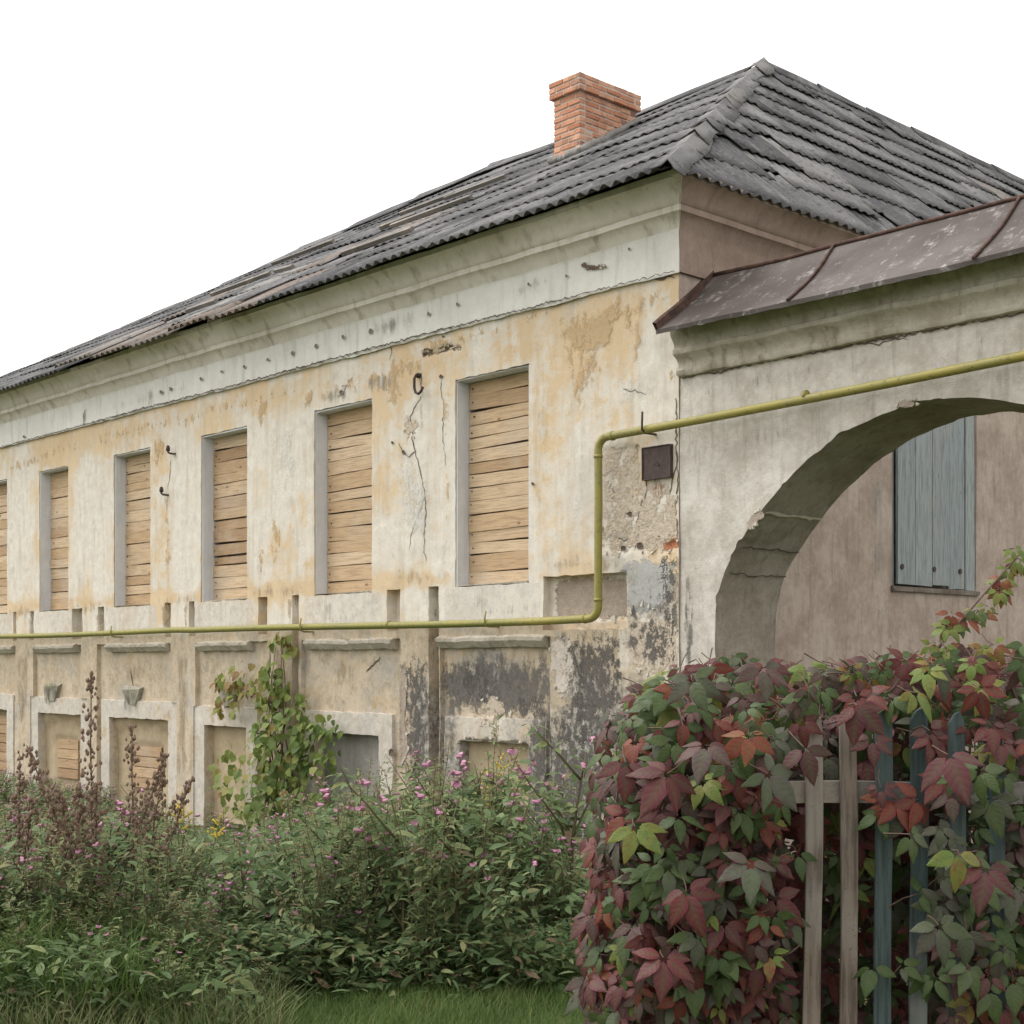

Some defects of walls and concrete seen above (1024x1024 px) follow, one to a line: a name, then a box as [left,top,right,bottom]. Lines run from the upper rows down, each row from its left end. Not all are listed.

crack [0,271,675,448]
peeling [368,328,483,403]
peeling [562,292,658,405]
crack [399,372,446,557]
spalling [553,443,679,676]
damp [404,555,692,854]